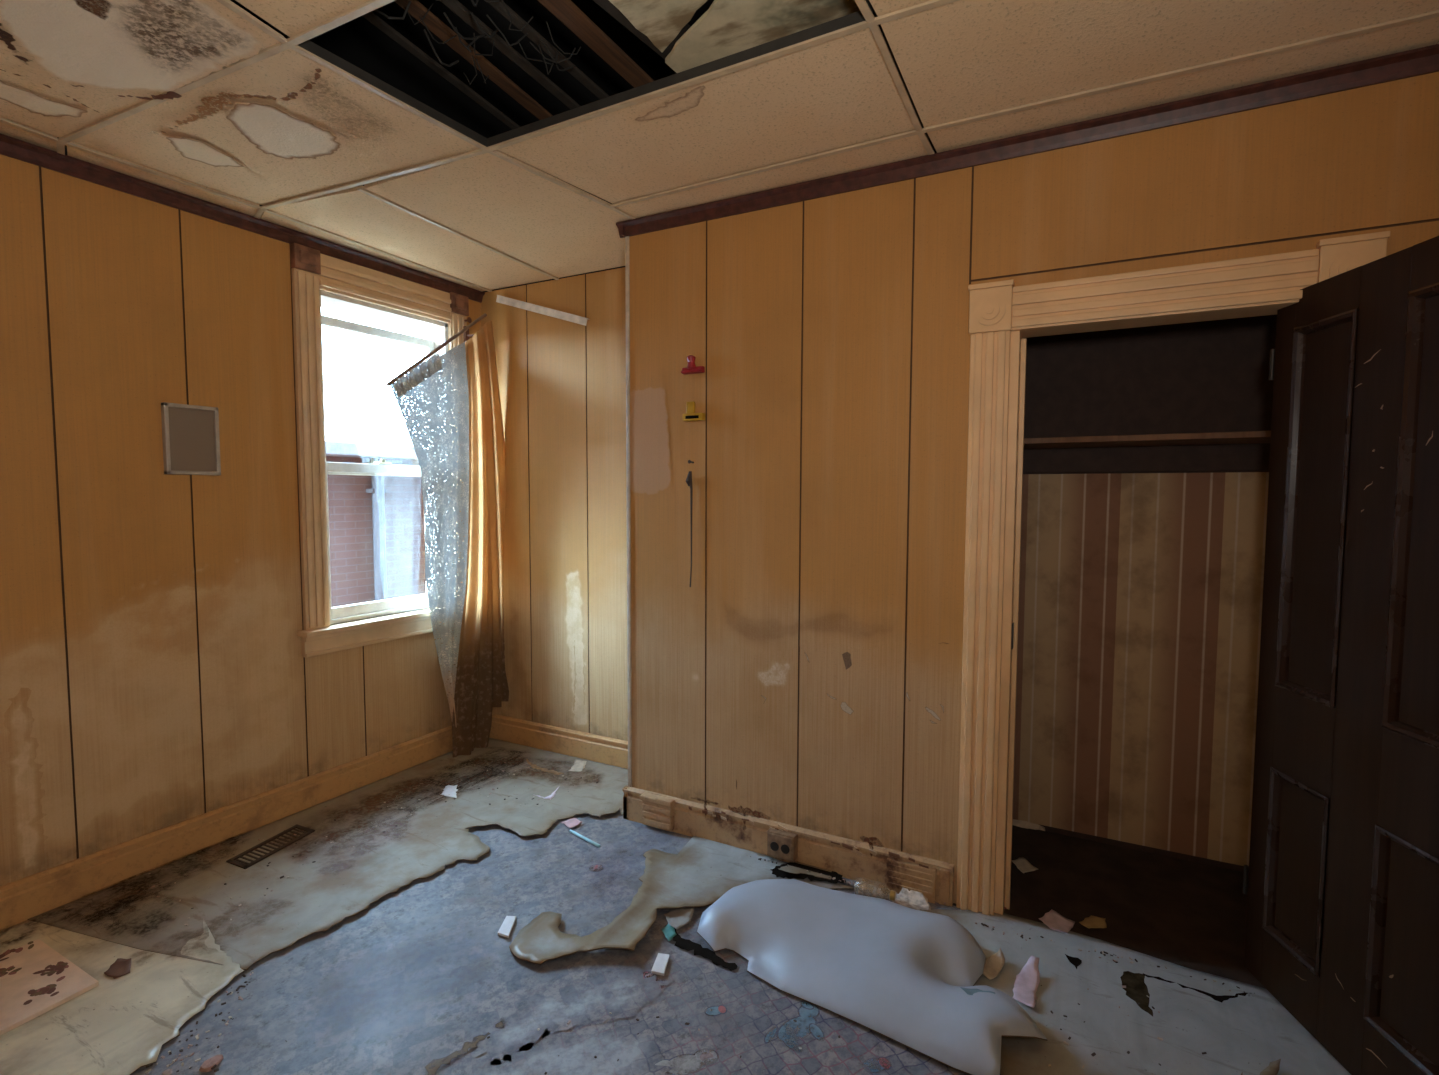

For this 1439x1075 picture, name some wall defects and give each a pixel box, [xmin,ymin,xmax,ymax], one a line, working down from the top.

water stain [0,0,271,118]
water stain [154,69,342,167]
water stain [0,548,307,880]